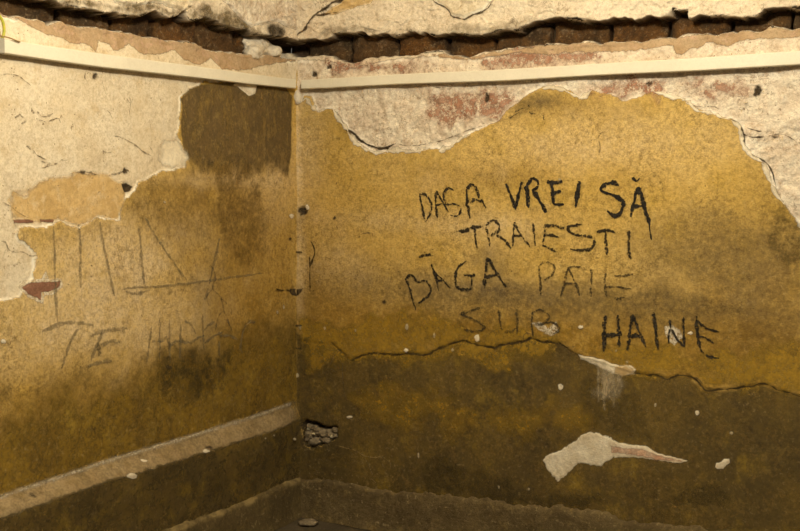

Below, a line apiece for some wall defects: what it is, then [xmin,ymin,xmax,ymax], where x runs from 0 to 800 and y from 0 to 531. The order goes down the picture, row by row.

crack [433,0,492,20]
peeling [0,0,800,227]
peeling [0,54,257,303]
damp [181,82,292,259]
crack [330,333,578,387]
peeling [578,354,636,375]
crack [635,373,800,397]
spalling [293,420,338,448]
damp [0,310,800,531]
peeling [543,432,687,482]